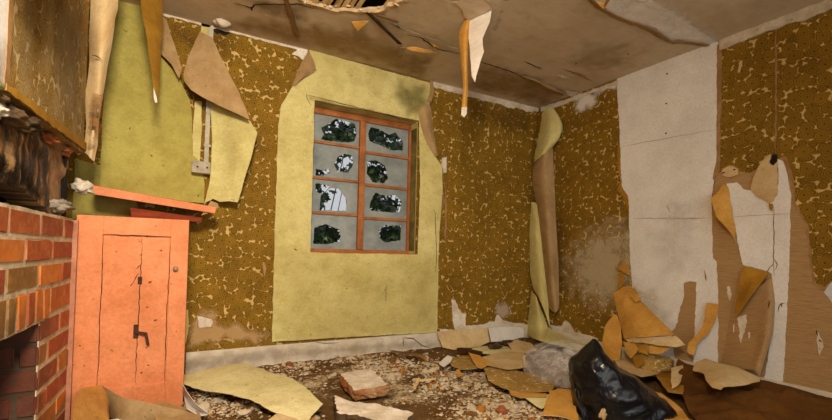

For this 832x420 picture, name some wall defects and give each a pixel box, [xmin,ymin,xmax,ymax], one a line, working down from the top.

flaking render [0,0,14,87]
peeling [84,0,118,161]
peeling [141,0,249,119]
crack [234,2,313,10]
spalling [292,46,308,60]
spalling [297,0,410,15]
peeling [588,0,717,47]
spalling [68,178,94,195]
flaking render [439,298,525,331]
water stain [565,219,630,308]
peeling [711,159,791,382]
flaking render [824,281,832,302]